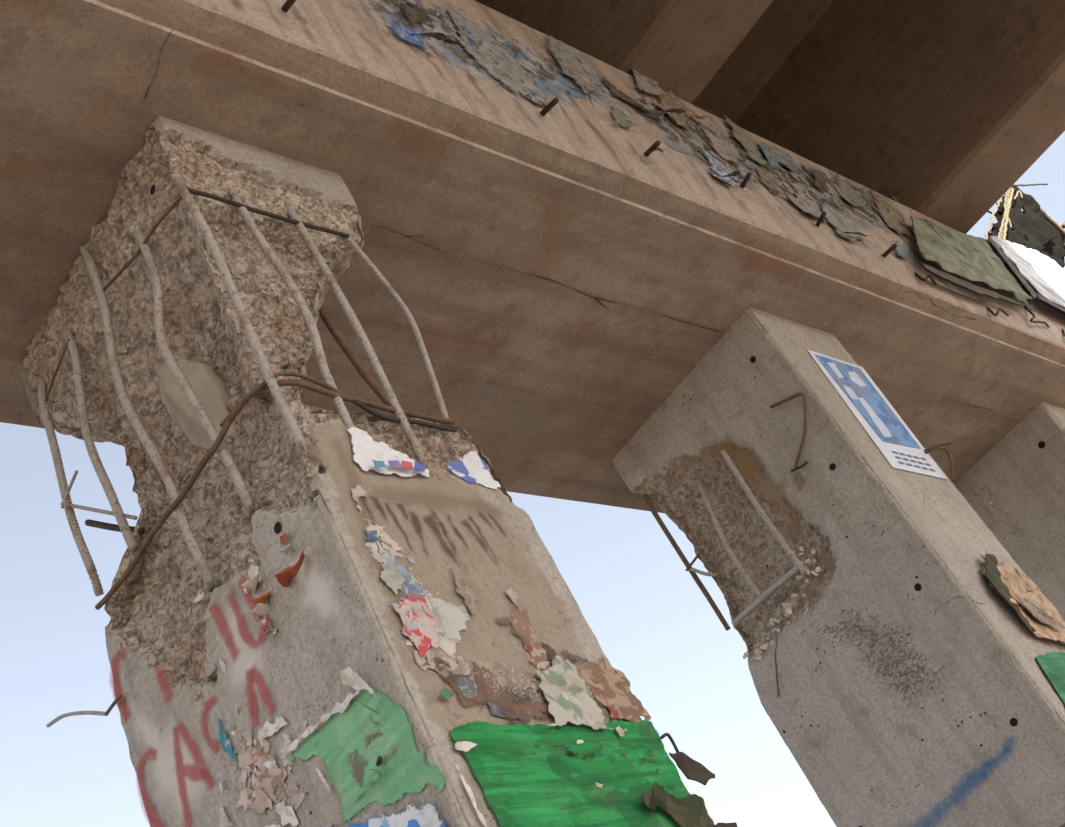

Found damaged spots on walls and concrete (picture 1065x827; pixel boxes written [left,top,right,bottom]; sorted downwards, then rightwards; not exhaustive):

crack [144,29,173,99]
crack [371,224,445,253]
crack [524,272,622,309]
spalling [22,126,513,705]
water stain [361,496,504,560]
spalling [632,441,953,726]